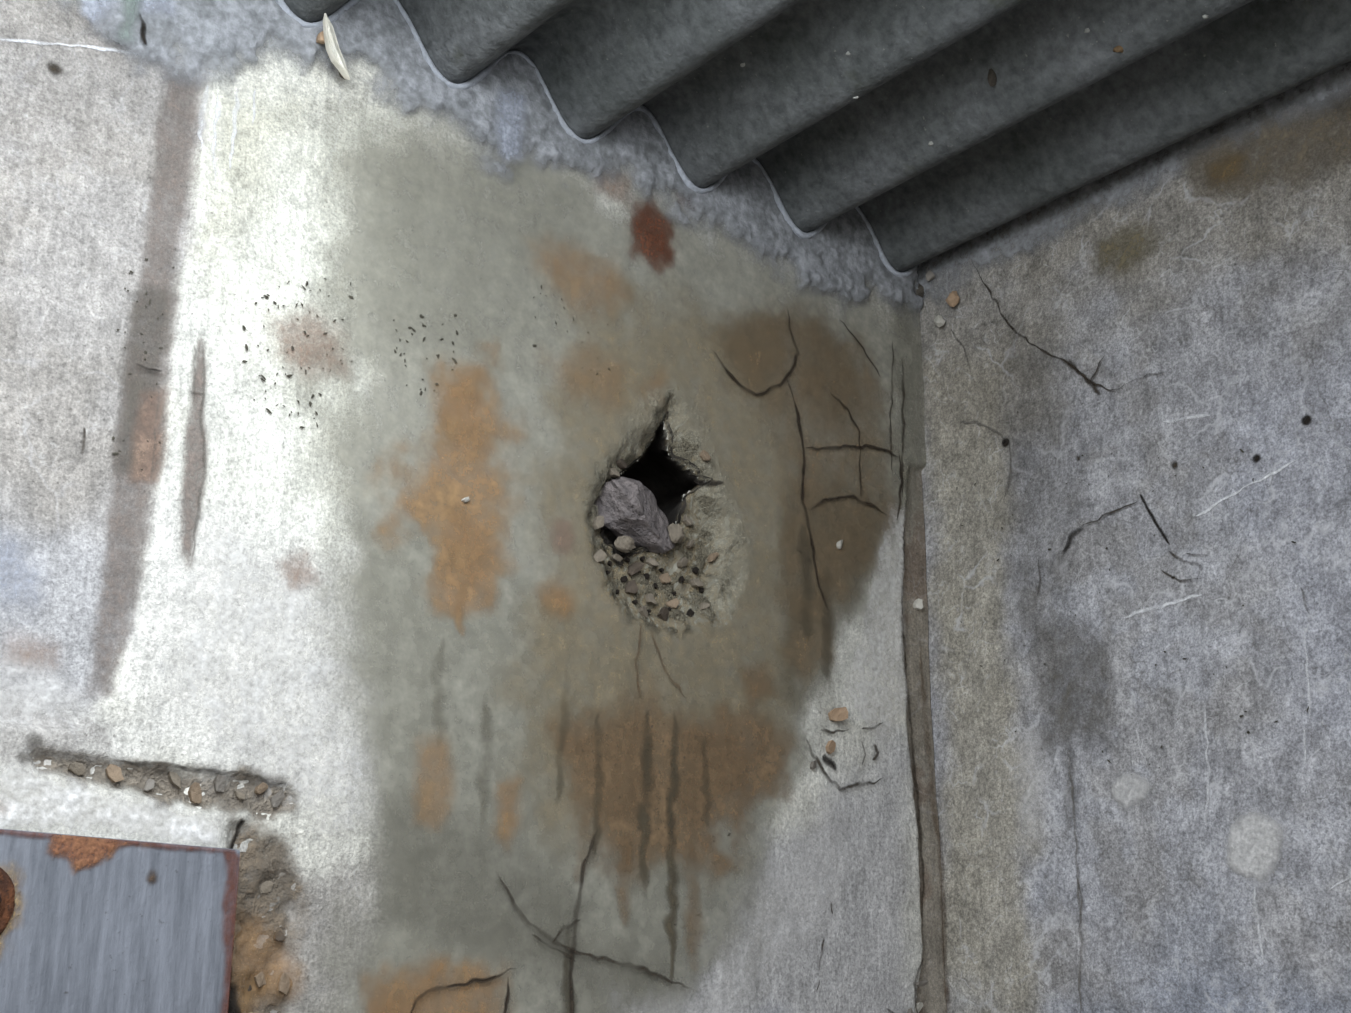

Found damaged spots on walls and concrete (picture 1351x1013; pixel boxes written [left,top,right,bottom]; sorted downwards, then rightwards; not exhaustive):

corrosion [633,206,673,268]
crack [974,266,1160,394]
corrosion [403,377,502,623]
leakage [253,92,918,1013]
spalling [585,389,745,635]
crack [715,313,925,916]
flaking render [19,735,302,1013]
corrosion [371,961,487,1013]
crack [499,835,685,1013]
corrosion [560,708,786,873]